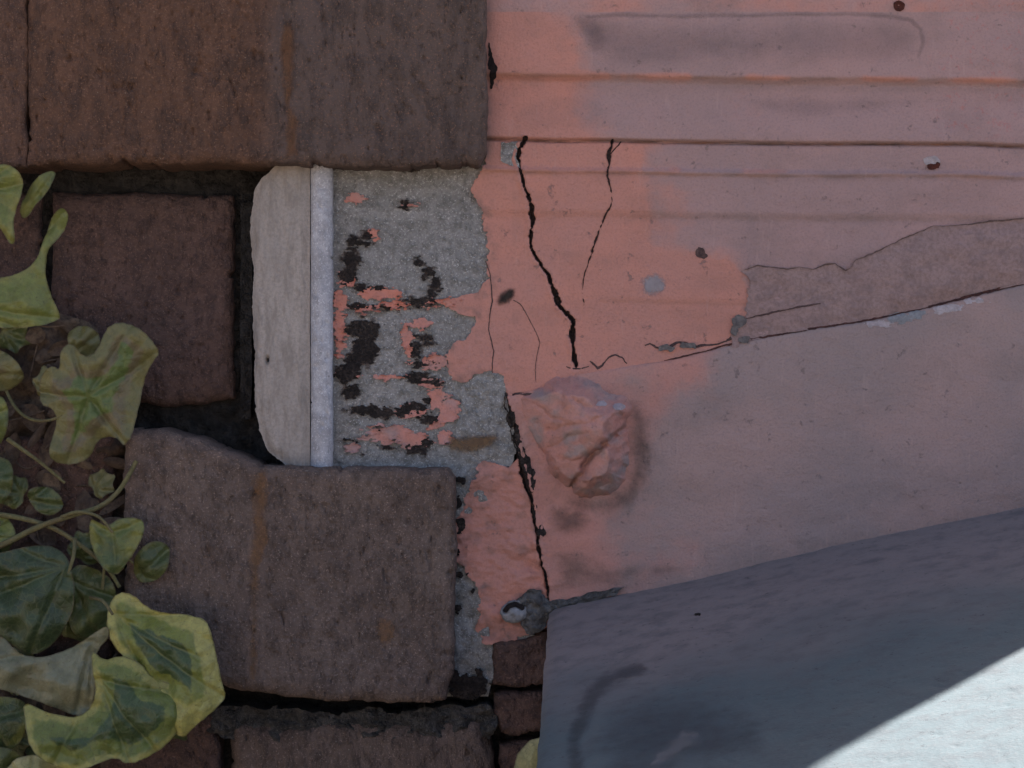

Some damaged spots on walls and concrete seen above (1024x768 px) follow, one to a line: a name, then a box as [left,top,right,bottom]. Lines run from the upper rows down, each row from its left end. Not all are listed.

spalling [397,198,421,211]
spalling [333,228,517,467]
crack [516,136,621,370]
spalling [644,218,1024,352]
crack [485,261,549,600]
spalling [456,476,466,534]
spalling [448,668,491,700]